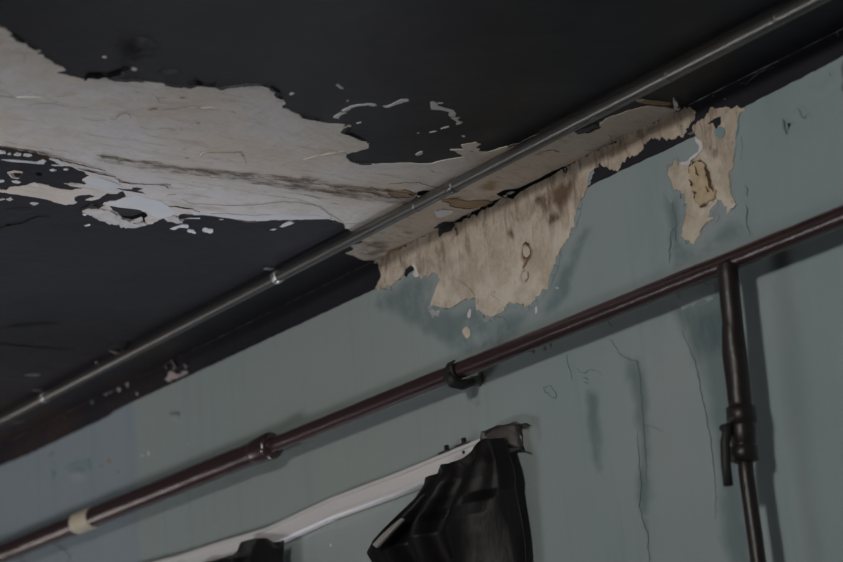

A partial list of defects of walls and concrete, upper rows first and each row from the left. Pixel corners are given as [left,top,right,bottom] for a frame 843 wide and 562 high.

peeling [0,27,536,234]
flaking render [346,98,746,339]
flaking render [165,360,189,382]
crack [608,321,657,562]
crack [682,331,717,518]